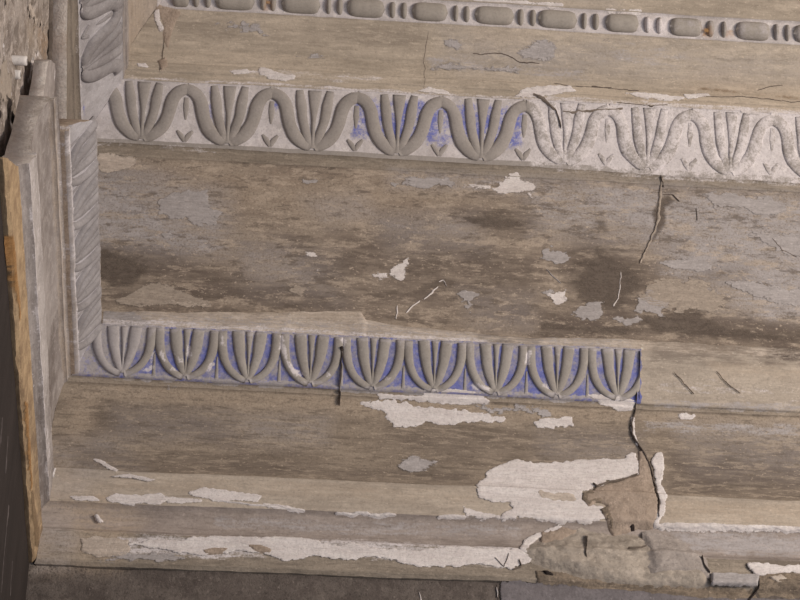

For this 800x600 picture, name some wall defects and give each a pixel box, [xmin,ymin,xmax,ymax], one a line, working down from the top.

crack [473,53,539,64]
crack [533,83,668,128]
peeling [390,172,536,198]
crack [640,176,679,263]
water stain [100,251,145,284]
water stain [577,250,639,307]
water stain [645,313,759,337]
peeling [360,388,574,429]
peeling [588,394,636,412]
crack [630,393,668,526]
peeling [70,451,800,570]
flaking render [535,562,800,600]